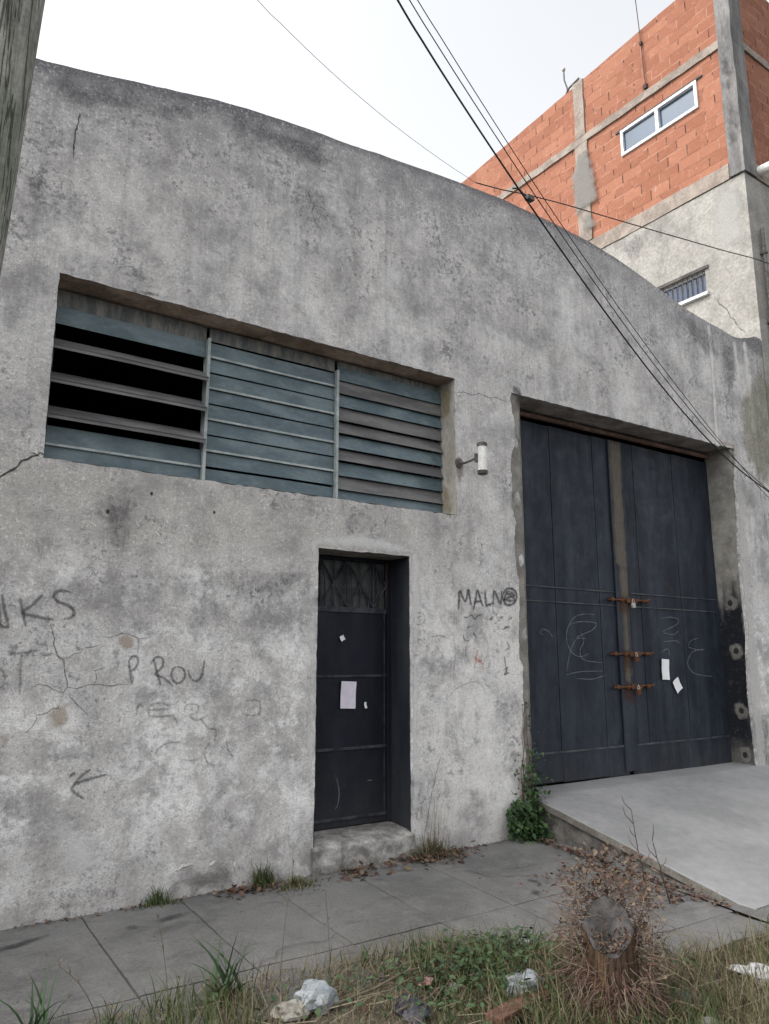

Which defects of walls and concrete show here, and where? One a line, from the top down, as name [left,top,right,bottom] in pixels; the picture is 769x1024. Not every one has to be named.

crack [73,113,81,157]
crack [0,452,44,478]
peeling [727,443,765,765]
crack [28,624,144,731]